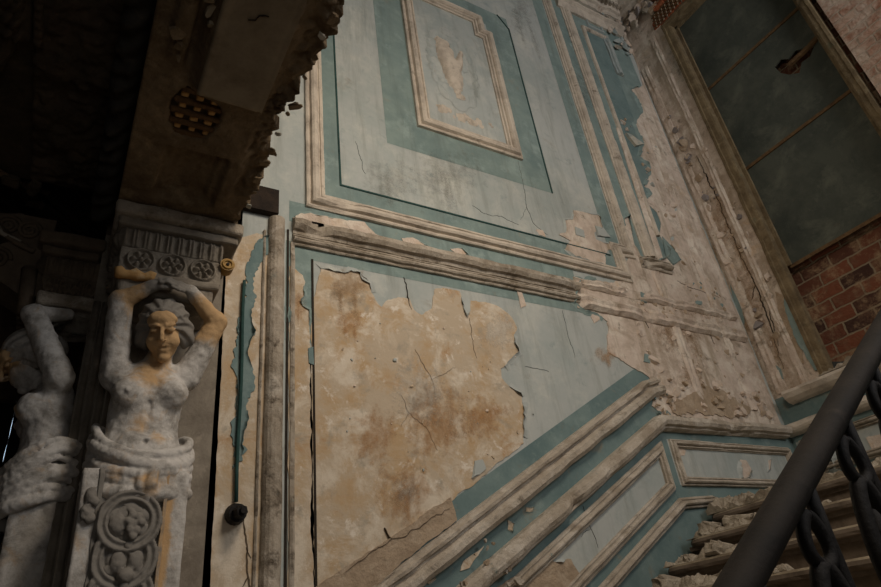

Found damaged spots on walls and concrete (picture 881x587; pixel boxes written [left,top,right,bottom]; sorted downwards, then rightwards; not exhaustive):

peeling [210,233,269,587]
peeling [259,147,277,166]
peeling [285,102,303,116]
peeling [285,264,534,587]
peeling [571,0,817,424]
crack [697,157,784,368]